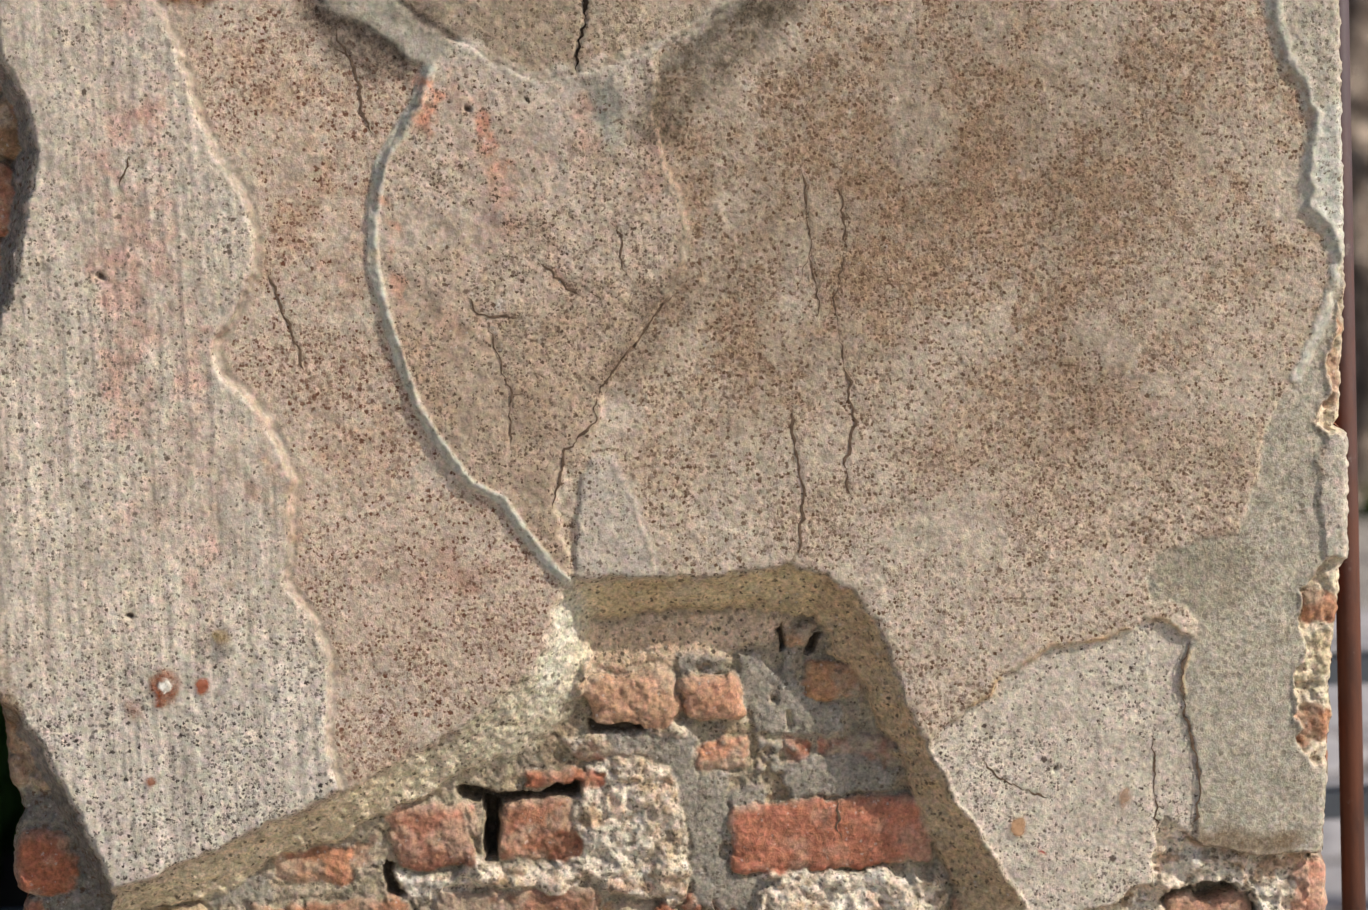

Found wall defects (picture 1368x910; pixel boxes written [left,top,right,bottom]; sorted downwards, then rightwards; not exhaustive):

damp [304,0,407,78]
crack [575,0,589,70]
damp [636,0,795,143]
crack [800,168,858,495]
spalling [1322,298,1344,410]
spalling [0,0,1029,910]
crack [790,410,806,554]
peeling [556,0,1339,910]
peeling [1320,433,1349,559]
crack [1151,642,1202,830]